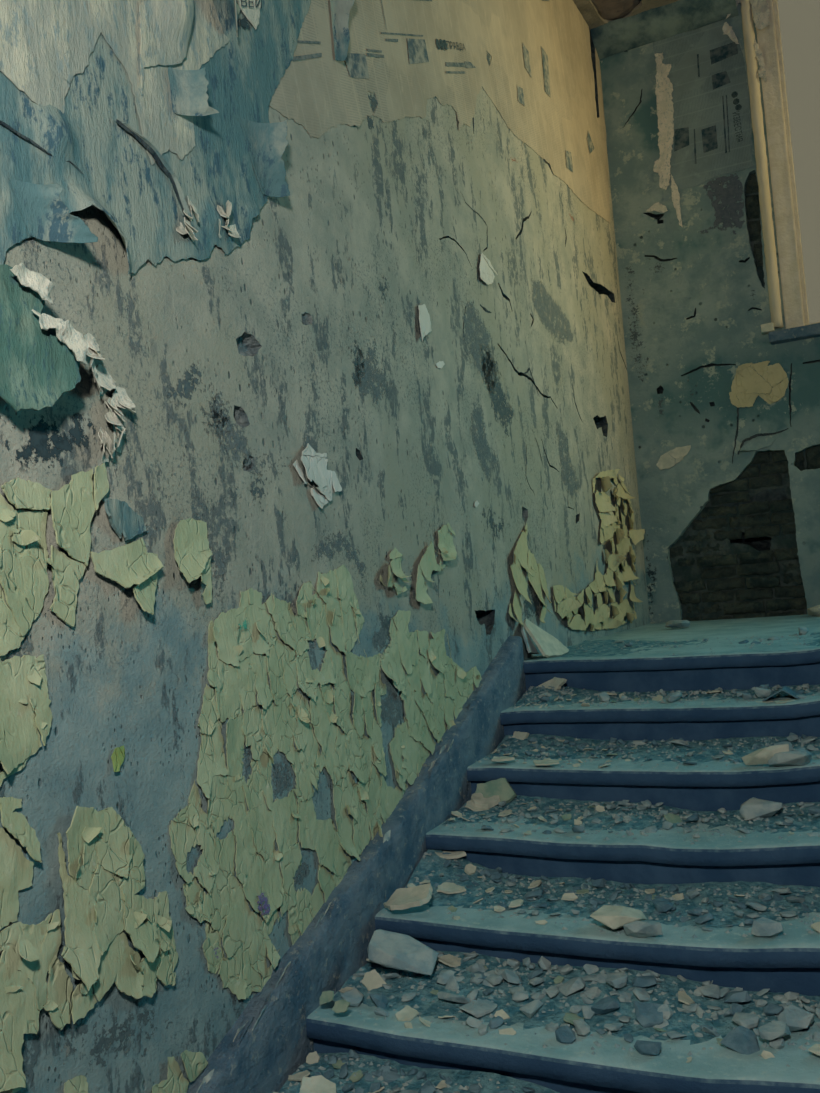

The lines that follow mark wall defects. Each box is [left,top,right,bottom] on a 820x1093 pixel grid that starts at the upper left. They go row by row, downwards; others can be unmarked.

crack [439,197,488,267]
crack [516,212,531,239]
crack [463,282,534,334]
crack [498,344,582,421]
peeling [729,361,789,408]
crack [732,360,820,464]
peeling [293,443,342,509]
peeling [509,469,645,631]
flaking render [667,444,820,621]
peeling [0,463,178,1093]
peeling [169,518,485,1054]
spalling [383,863,542,920]